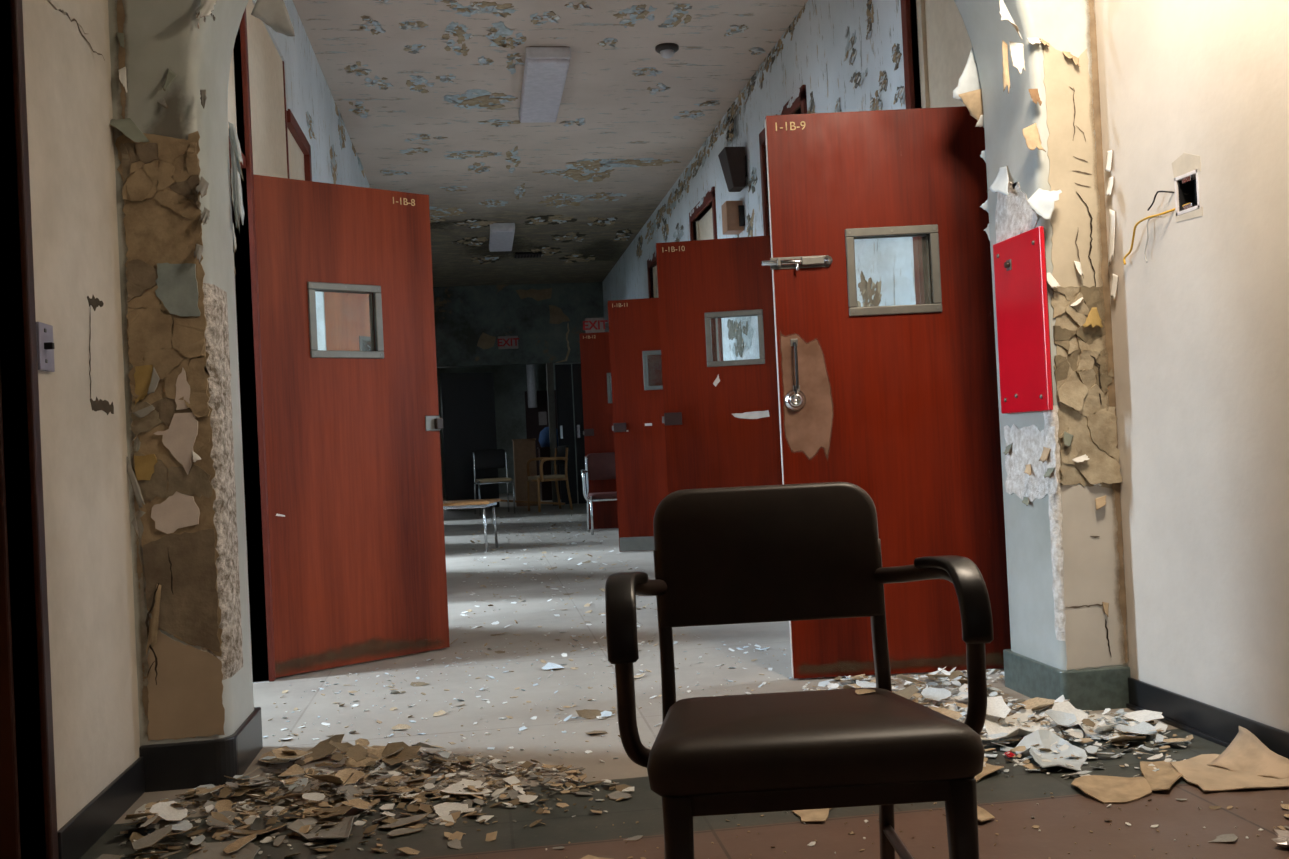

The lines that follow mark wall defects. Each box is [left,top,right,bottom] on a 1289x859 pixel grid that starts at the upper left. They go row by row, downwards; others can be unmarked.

crack [47,0,105,60]
peeling [360,16,428,54]
peeling [306,111,317,140]
peeling [330,101,371,188]
peeling [344,61,521,127]
peeling [399,0,806,265]
spalling [777,89,815,115]
peeling [995,38,1102,288]
flaking render [87,295,104,311]
flaking render [90,397,114,415]
peeling [115,131,243,680]
crack [1066,602,1111,655]